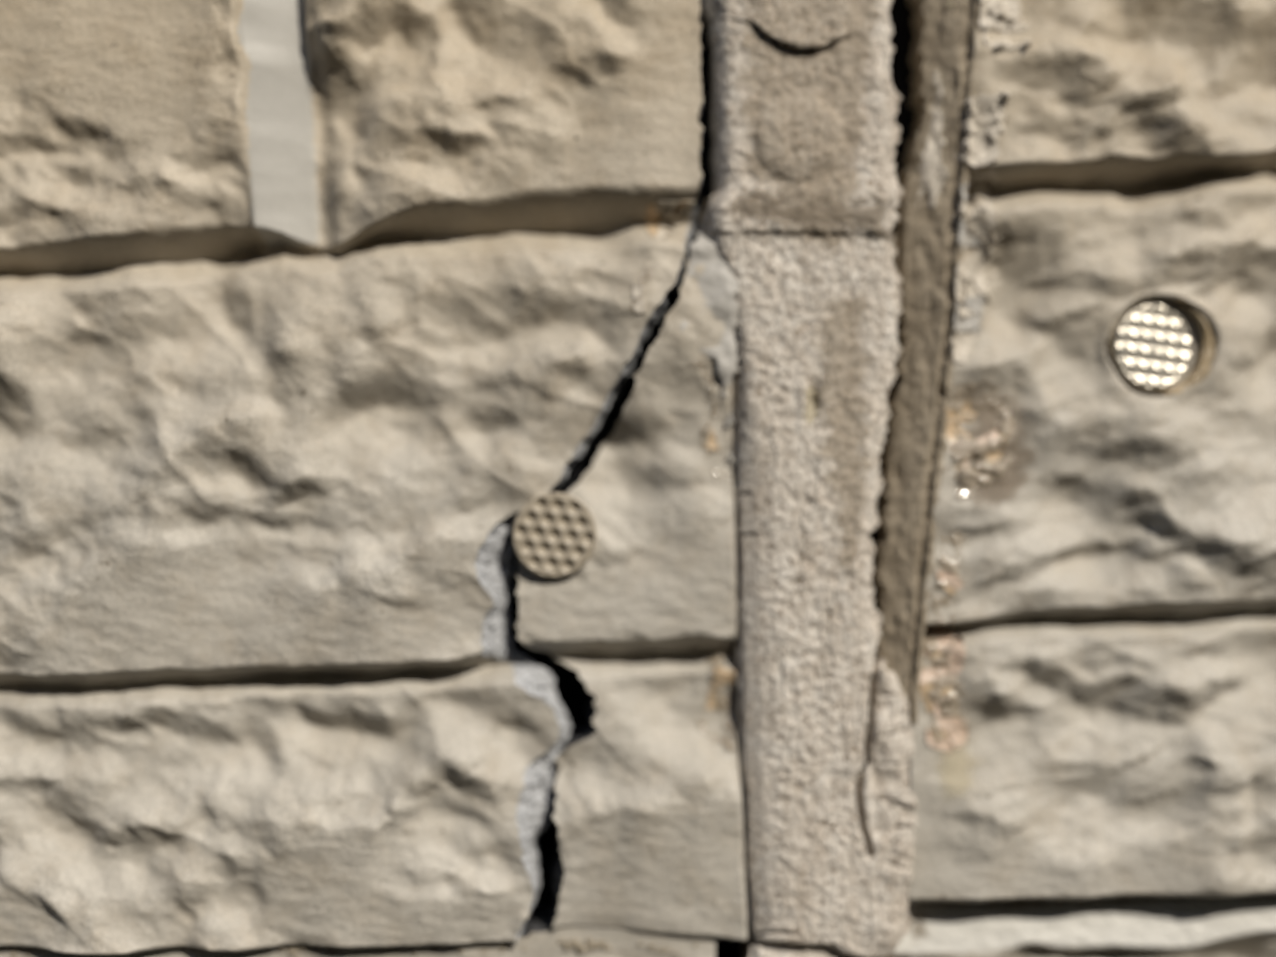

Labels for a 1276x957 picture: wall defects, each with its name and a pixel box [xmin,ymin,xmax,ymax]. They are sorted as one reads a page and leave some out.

crack [548,17,847,494]
crack [889,0,918,186]
peeling [951,91,1011,363]
peeling [944,382,1018,500]
crack [475,511,641,944]
peeling [919,532,969,752]